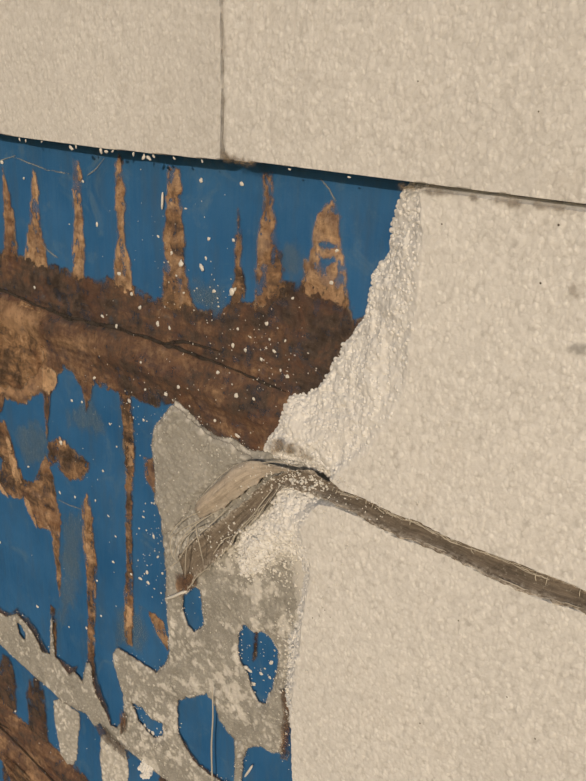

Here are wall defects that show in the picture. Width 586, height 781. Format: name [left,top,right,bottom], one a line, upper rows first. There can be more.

spalling [195,0,234,160]
spalling [0,323,57,395]
peeling [0,420,89,596]
crack [0,289,286,392]
rust [0,156,364,650]
peeling [152,405,252,534]
spalling [263,181,586,507]
rust [0,605,77,674]
rust [0,655,88,781]
rust [82,494,129,759]
spalling [236,487,433,728]